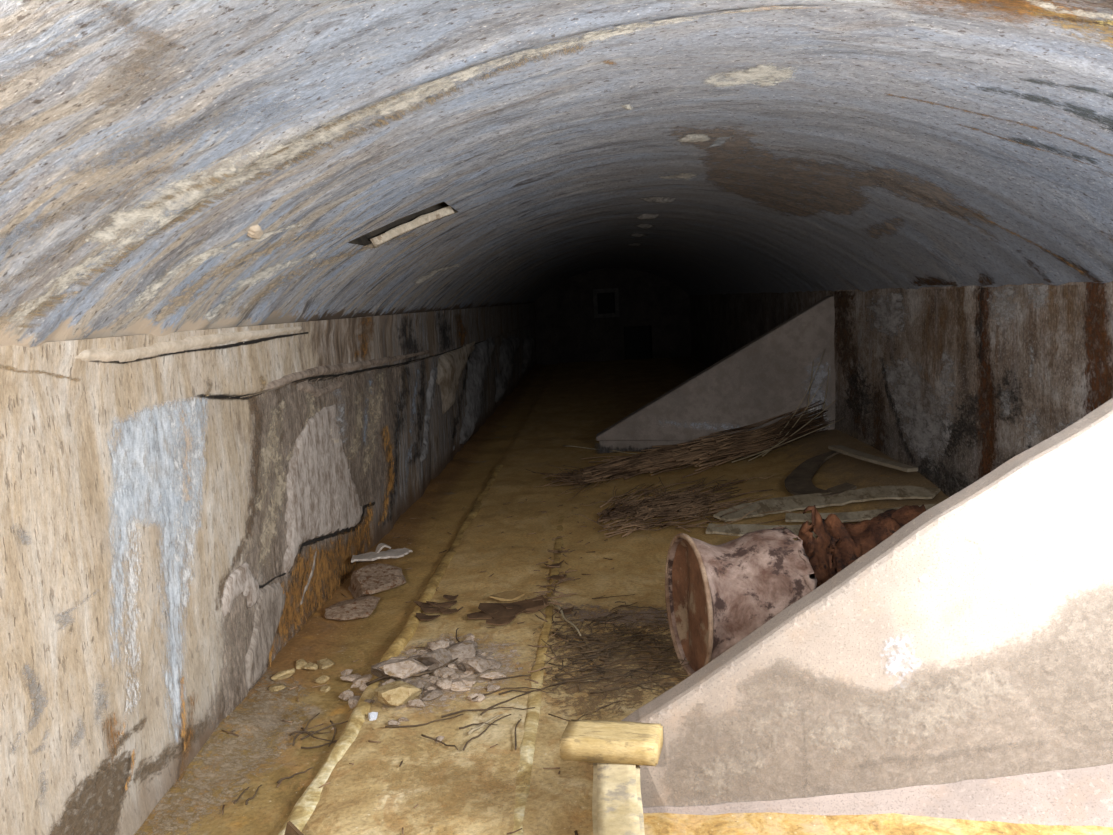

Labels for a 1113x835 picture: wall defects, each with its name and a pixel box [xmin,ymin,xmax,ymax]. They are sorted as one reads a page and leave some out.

water stain [0,5,811,329]
spalling [705,65,794,87]
corrosion [899,0,1113,47]
water stain [978,80,1113,130]
water stain [1012,139,1096,164]
crack [1,326,309,381]
crack [198,341,483,400]
corrosion [834,291,887,451]
corrosion [914,274,998,480]
corrosion [1027,250,1113,416]
water stain [51,398,207,835]
water stain [664,586,1113,804]